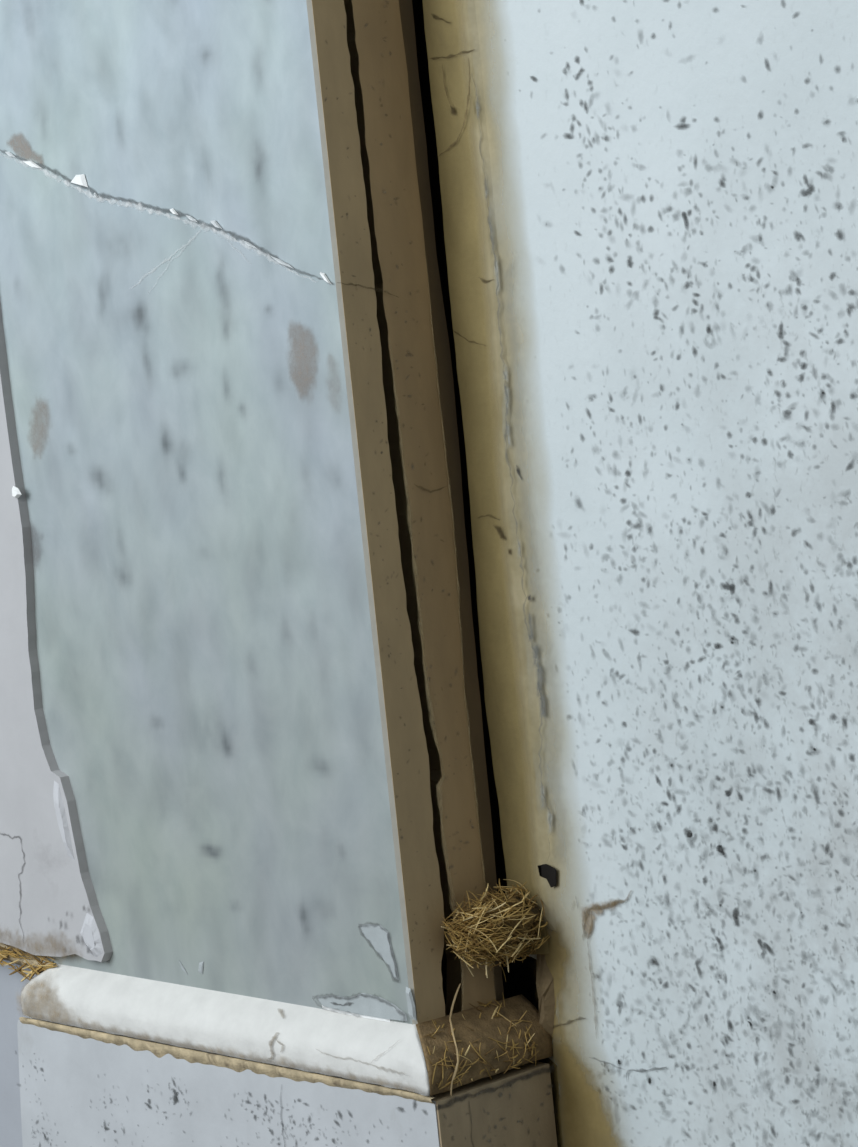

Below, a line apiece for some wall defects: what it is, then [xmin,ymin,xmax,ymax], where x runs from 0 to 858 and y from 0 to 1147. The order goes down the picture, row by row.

crack [5,136,332,284]
peeling [53,781,75,861]
peeling [77,907,103,957]
peeling [316,924,416,1022]